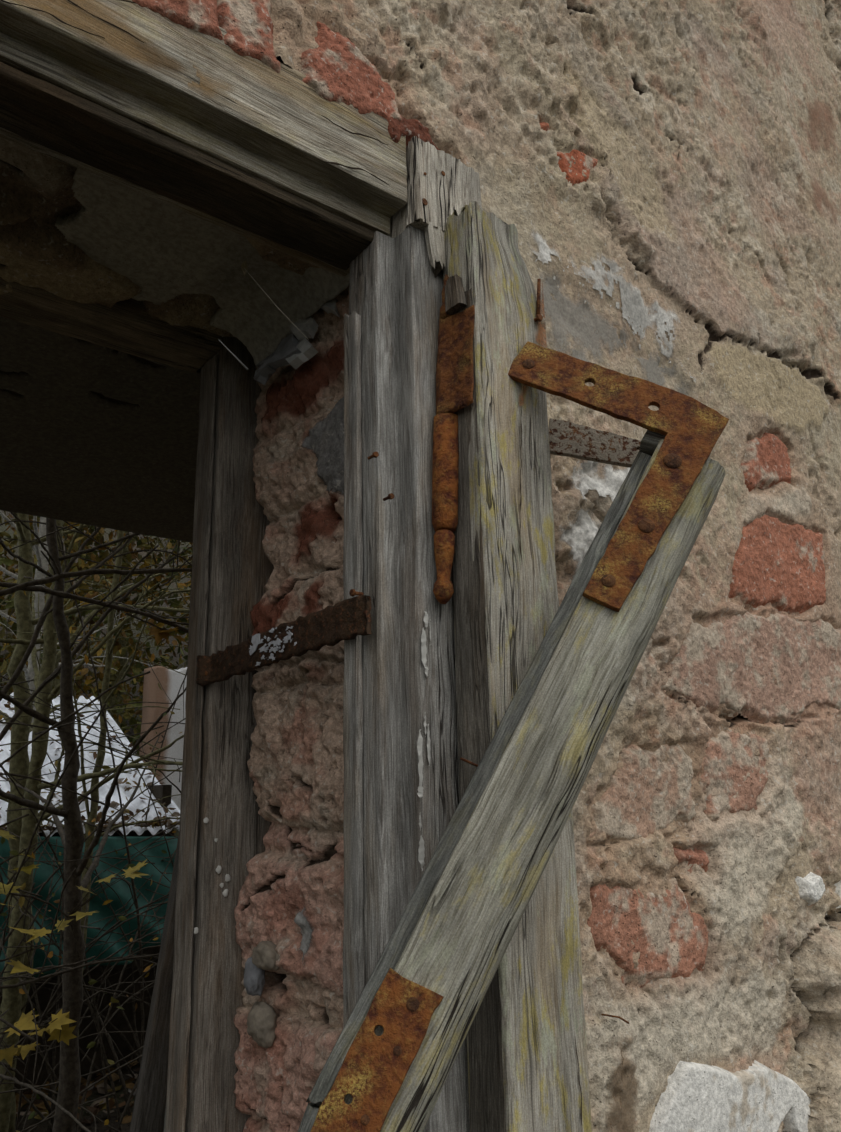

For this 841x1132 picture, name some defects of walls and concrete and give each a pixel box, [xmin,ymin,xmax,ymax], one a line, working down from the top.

spalling [132,0,281,73]
spalling [300,21,446,153]
peeling [55,168,350,421]
crack [670,288,839,400]
spalling [741,432,791,492]
spalling [296,495,342,560]
spalling [249,597,297,666]
spalling [303,583,321,615]
spalling [586,515,841,845]
spalling [587,847,709,988]